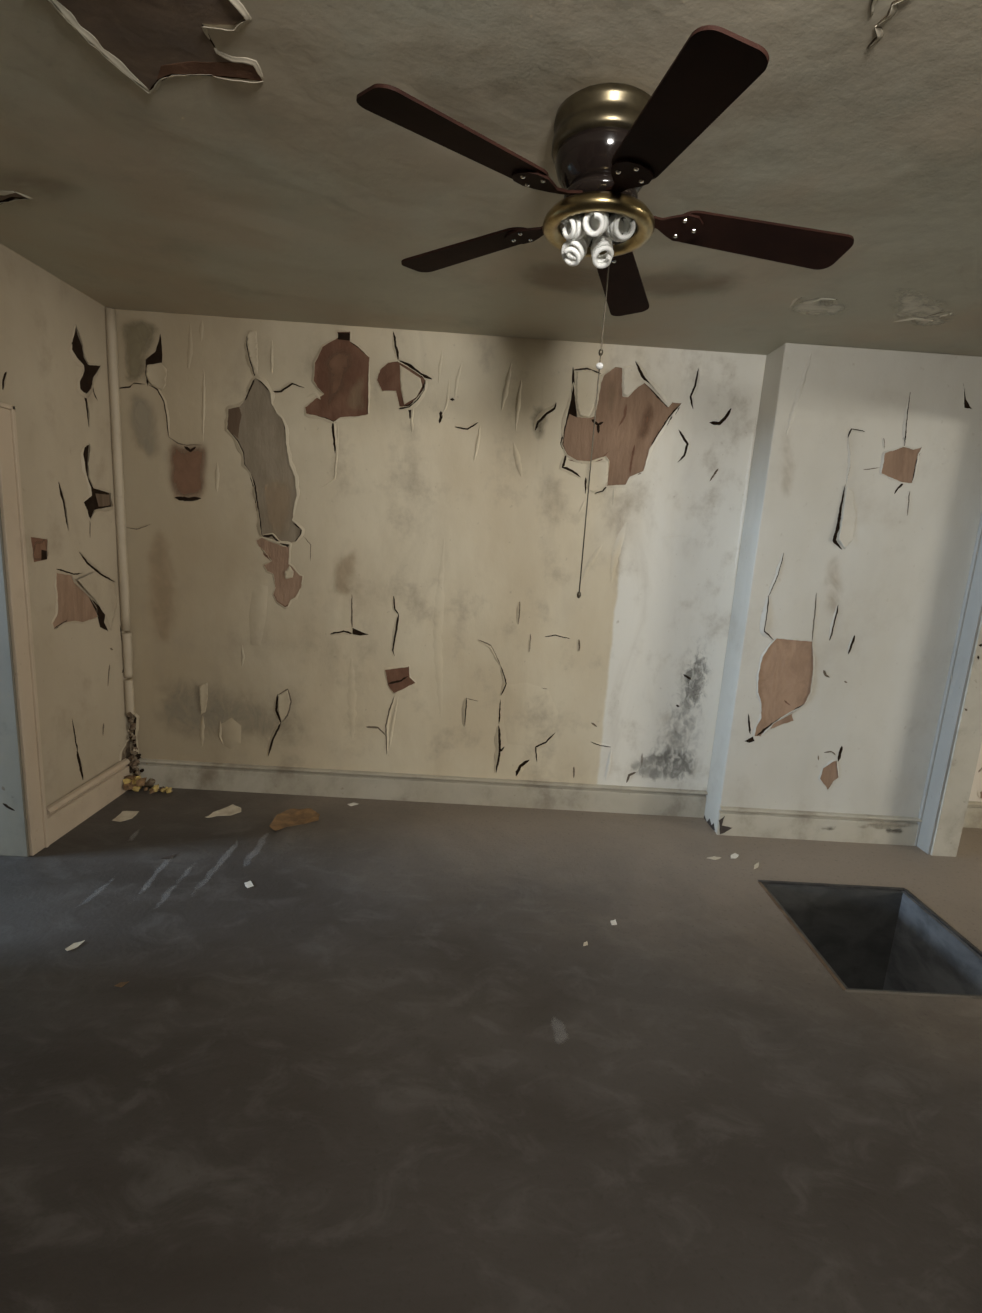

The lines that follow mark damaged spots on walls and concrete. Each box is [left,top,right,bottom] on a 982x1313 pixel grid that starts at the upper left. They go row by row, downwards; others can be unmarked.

peeling [47,0,264,94]
crack [867,0,906,49]
peeling [69,324,101,426]
peeling [81,443,113,525]
peeling [145,334,220,501]
peeling [224,330,433,609]
peeling [559,361,683,512]
peeling [833,393,923,549]
peeling [30,536,122,640]
peeling [384,665,416,694]
crack [462,602,580,776]
peeling [744,553,817,743]